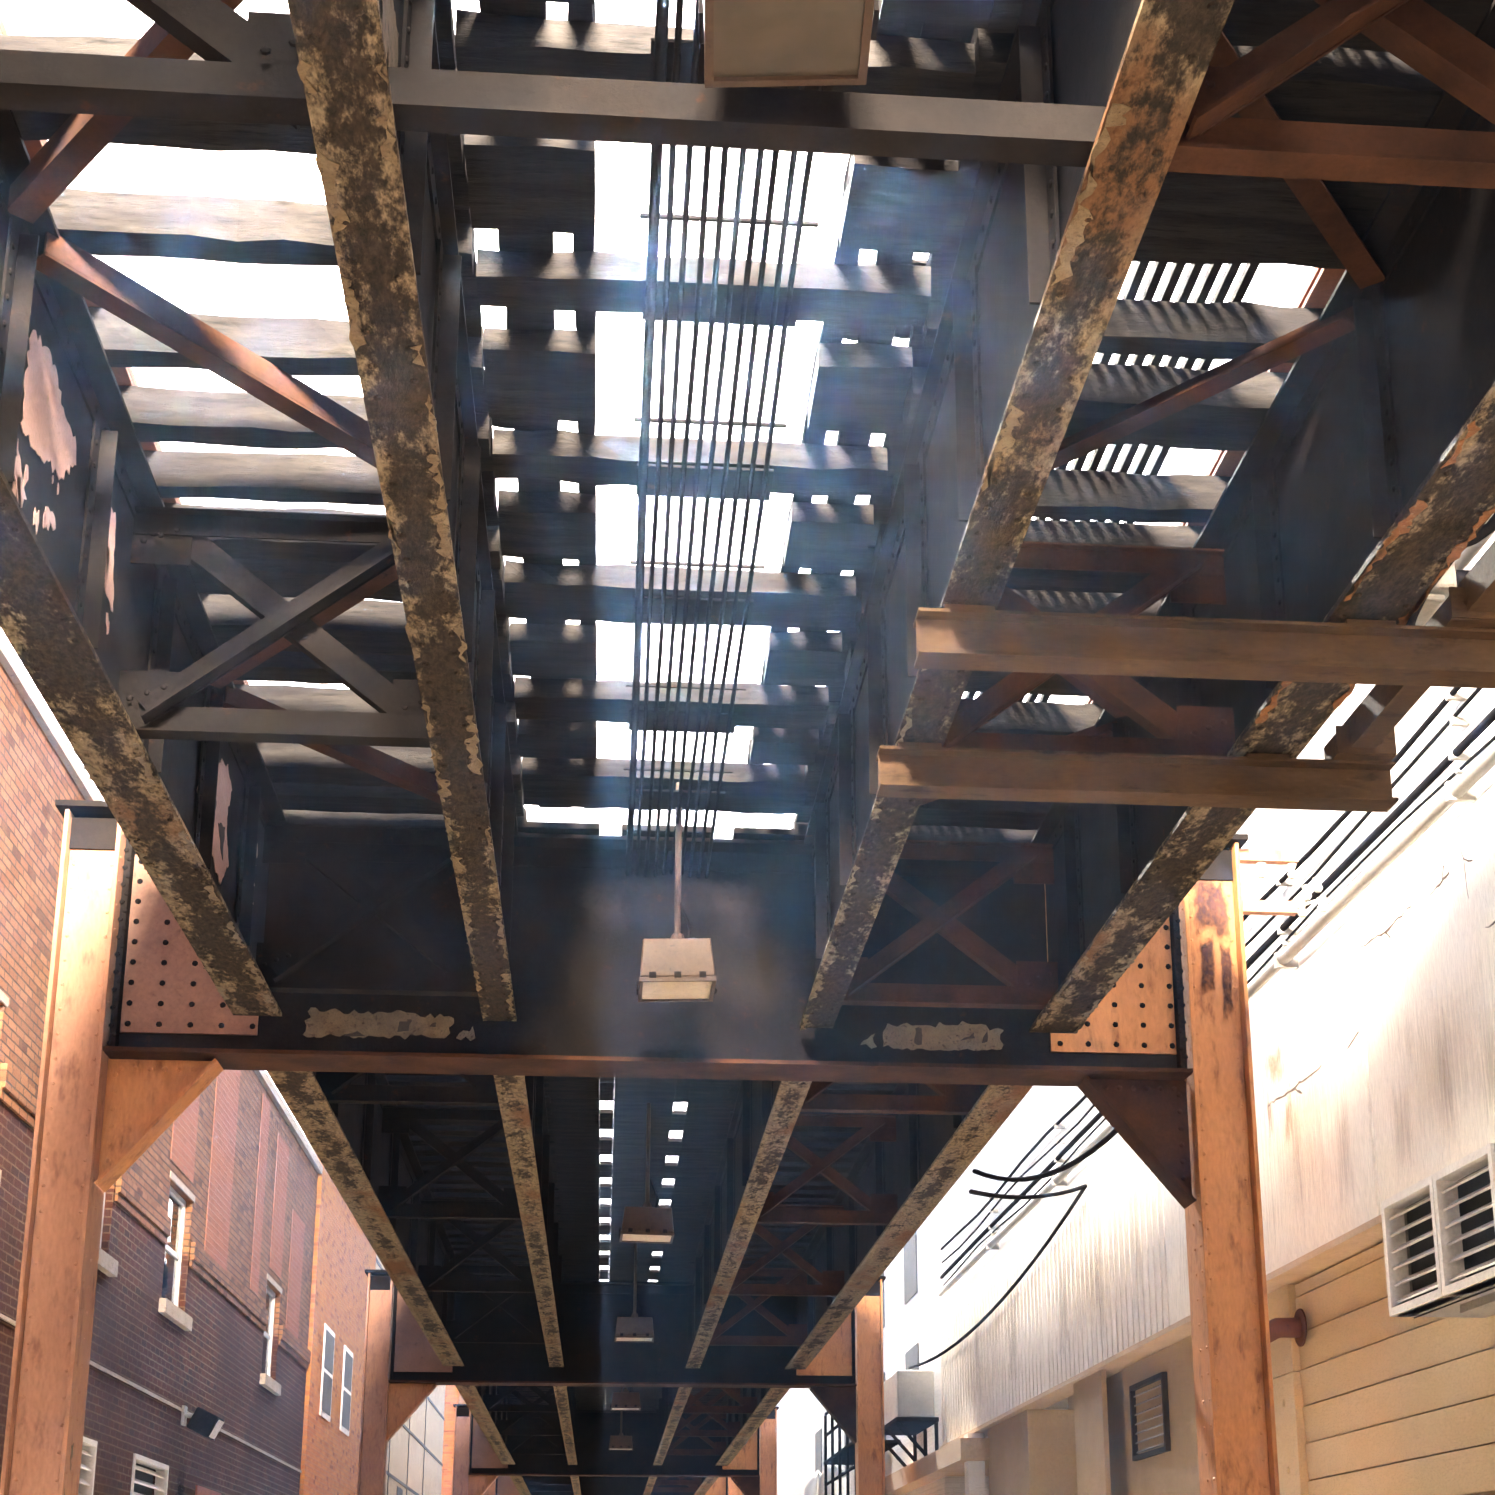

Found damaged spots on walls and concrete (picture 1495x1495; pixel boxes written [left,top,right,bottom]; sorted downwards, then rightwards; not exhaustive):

peeling [12,329,77,534]
rust [1344,499,1428,601]
rust [1397,507,1495,625]
rust [1255,681,1292,724]
rust [1333,684,1355,711]
peeling [70,741,101,785]
peeling [127,837,161,888]
peeling [168,759,232,901]
crack [1359,834,1495,948]
rust [1193,881,1233,1017]
peeling [303,1007,475,1041]
peeling [860,1021,1004,1051]